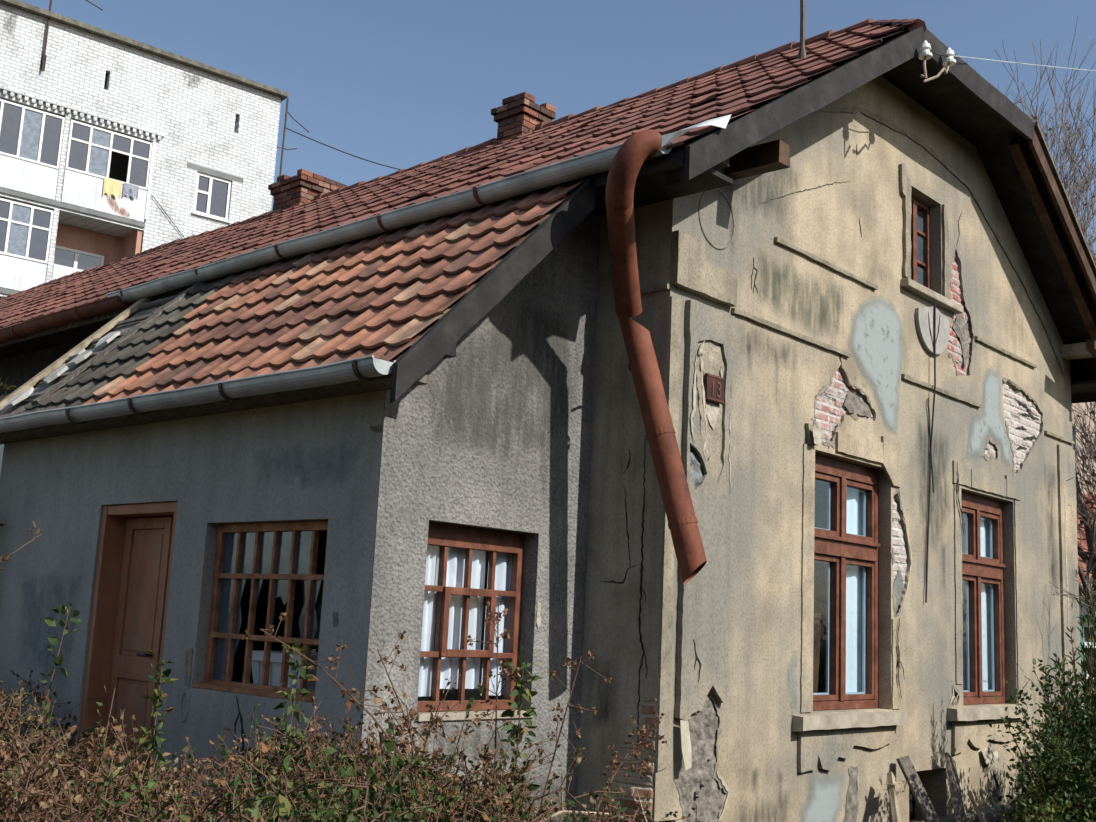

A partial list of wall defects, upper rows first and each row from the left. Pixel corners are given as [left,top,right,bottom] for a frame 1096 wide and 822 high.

water stain [764,266,840,324]
flaking render [947,254,975,376]
flaking render [690,340,732,494]
flaking render [811,349,873,449]
flaking render [982,377,1044,478]
crack [602,435,647,760]
flaking render [891,488,912,621]
flaking render [673,693,730,822]
flaking render [982,747,1002,807]